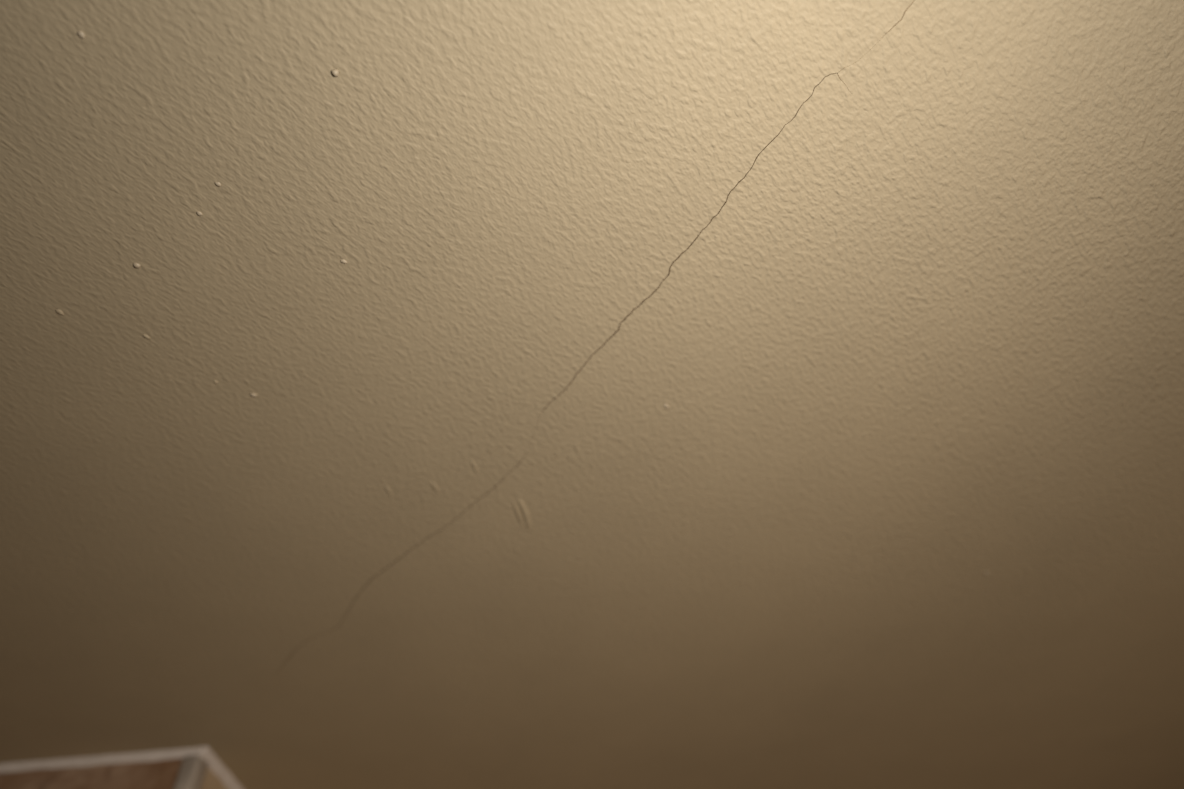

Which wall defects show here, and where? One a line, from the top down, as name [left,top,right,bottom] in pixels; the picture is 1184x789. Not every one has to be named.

crack [275,0,915,674]